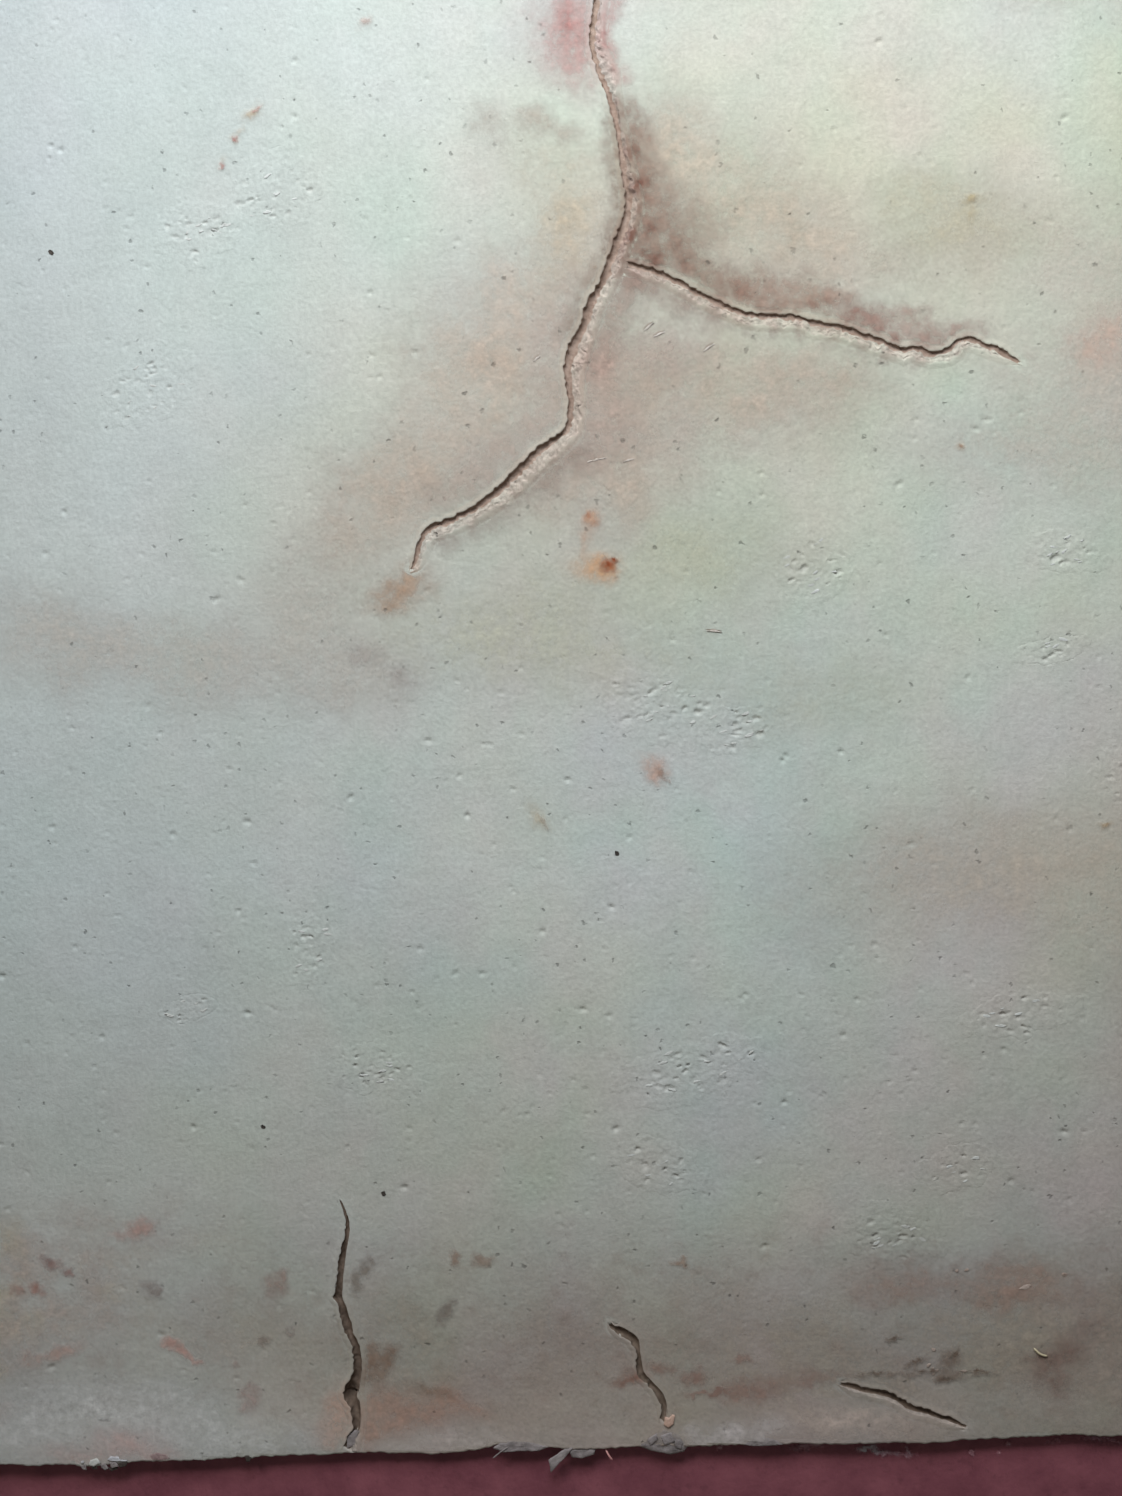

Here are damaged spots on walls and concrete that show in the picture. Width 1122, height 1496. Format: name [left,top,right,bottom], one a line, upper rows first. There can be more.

water stain [542,0,587,74]
water stain [626,101,962,344]
crack [408,0,1022,573]
corrosion [588,555,617,579]
water stain [1,1387,270,1456]
crack [327,1196,368,1452]
crack [607,1320,673,1427]
water stain [645,1265,1122,1445]
crack [836,1378,969,1431]